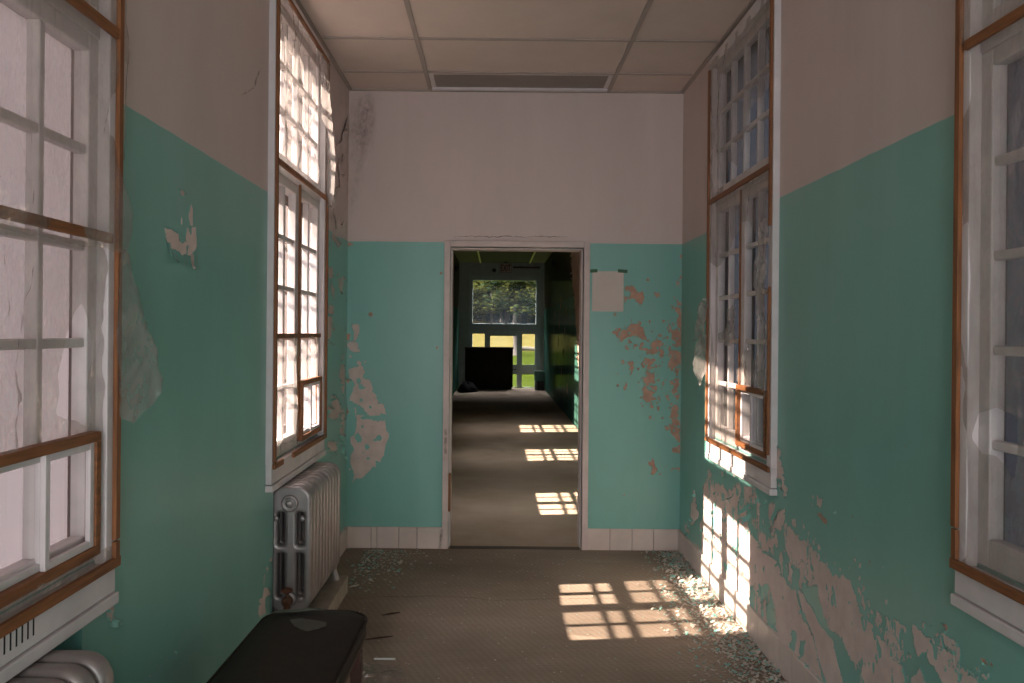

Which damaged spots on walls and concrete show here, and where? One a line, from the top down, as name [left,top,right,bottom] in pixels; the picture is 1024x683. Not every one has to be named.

peeling [164,187,200,269]
peeling [327,234,390,483]
peeling [612,254,682,454]
peeling [637,550,788,683]
peeling [684,446,995,683]